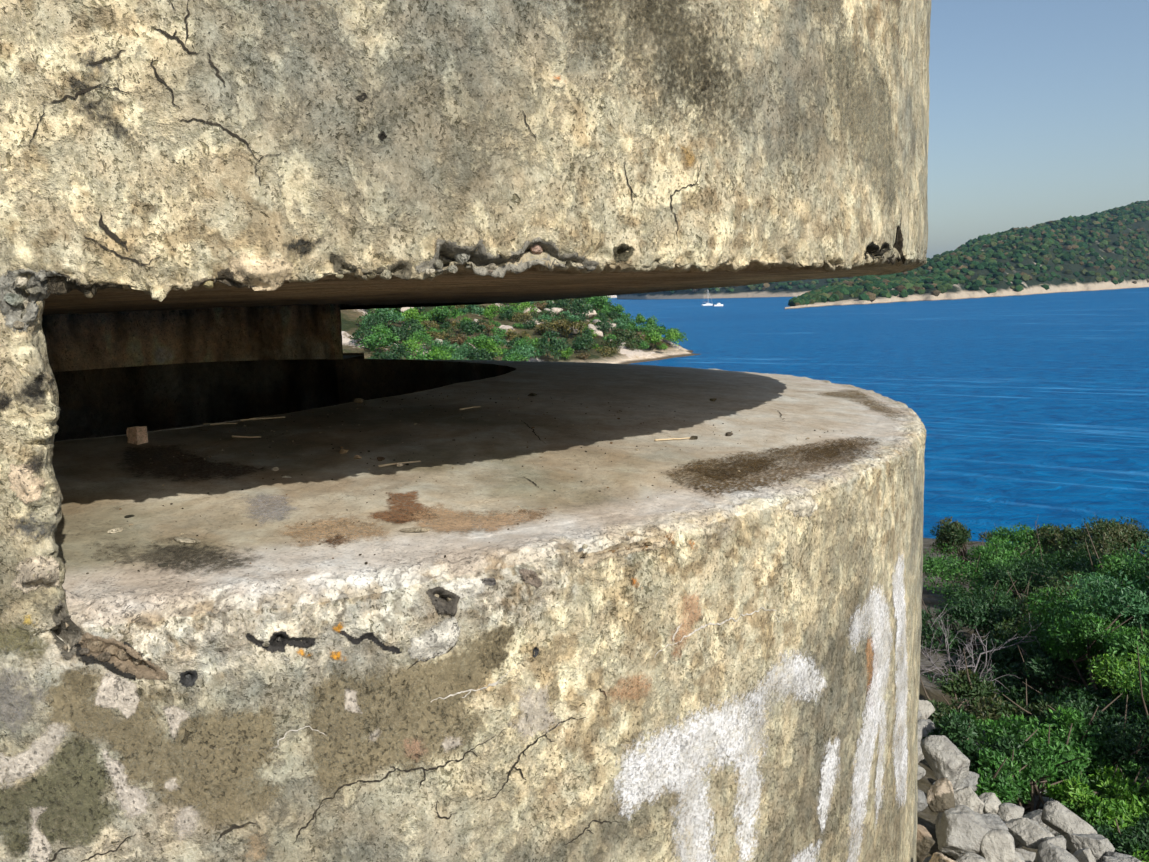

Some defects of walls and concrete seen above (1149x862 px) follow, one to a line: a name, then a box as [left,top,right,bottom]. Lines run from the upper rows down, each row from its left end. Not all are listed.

crack [29,50,132,144]
crack [150,2,281,185]
crack [84,211,160,266]
spalling [330,237,635,280]
spalling [0,268,123,333]
water stain [688,457,776,481]
water stain [800,442,860,462]
spalling [426,587,460,616]
spalling [49,600,198,718]
spalling [243,631,315,653]
water stain [0,670,279,856]
crack [293,729,505,844]